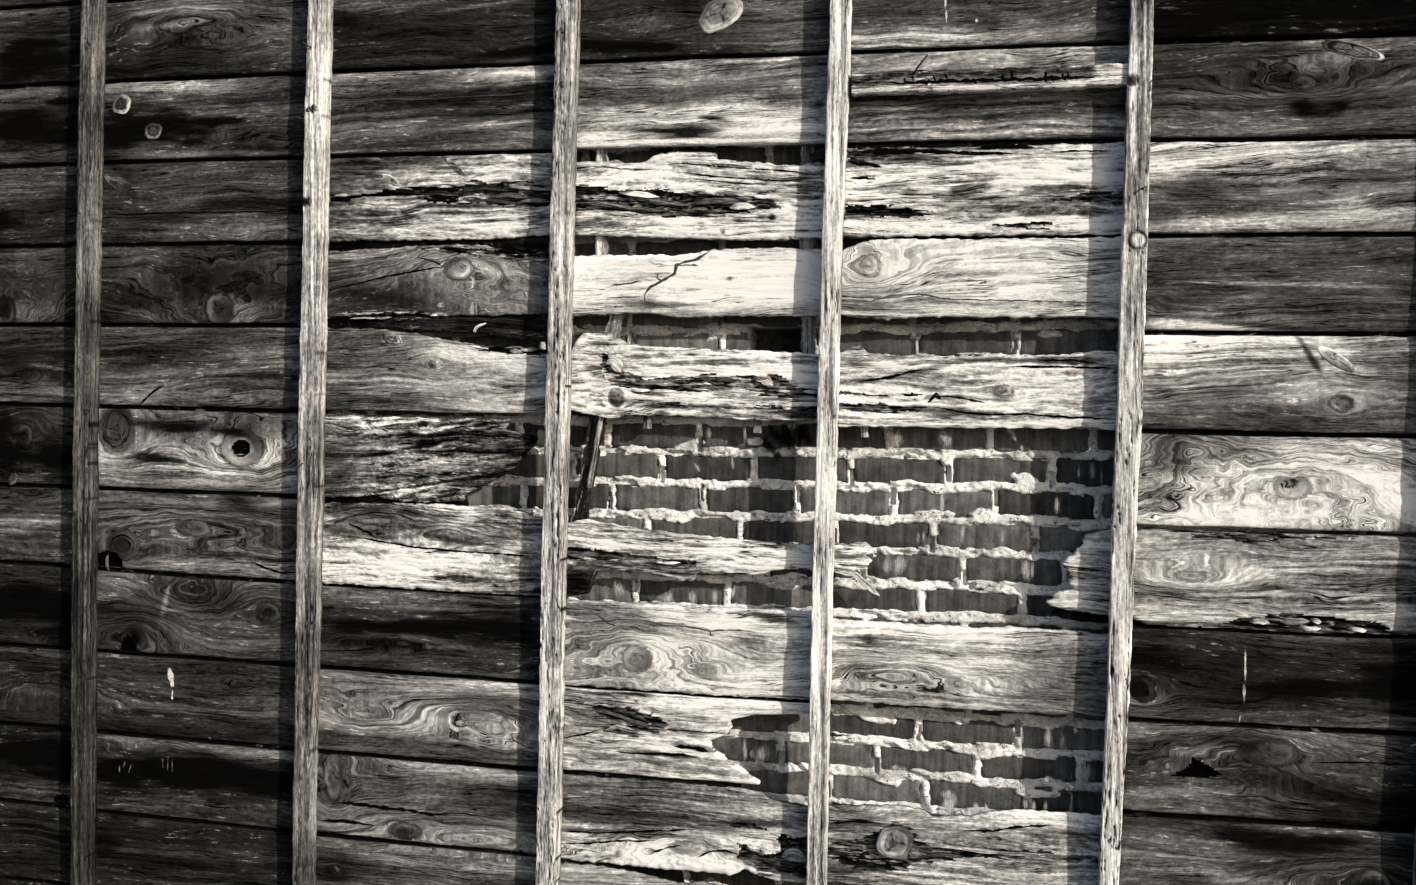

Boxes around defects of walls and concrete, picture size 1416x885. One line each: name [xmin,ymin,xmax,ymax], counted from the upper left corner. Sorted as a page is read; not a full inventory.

crack [609,251,710,307]